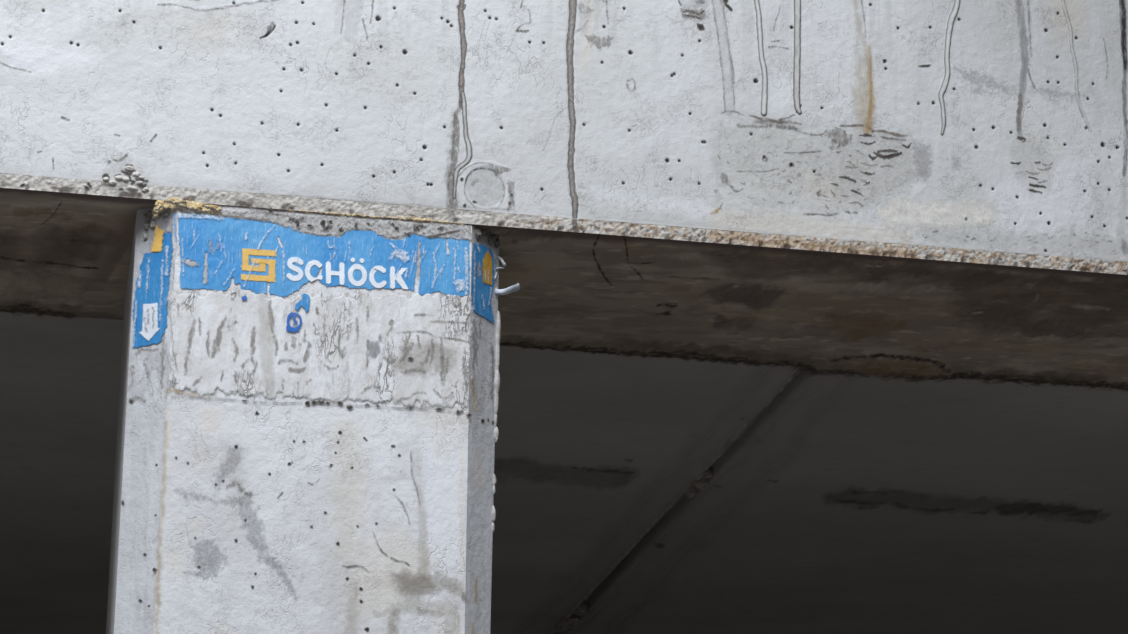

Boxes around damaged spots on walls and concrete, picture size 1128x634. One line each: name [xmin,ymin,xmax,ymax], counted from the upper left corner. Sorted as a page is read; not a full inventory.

crack [447,0,472,215]
crack [566,0,648,283]
water stain [754,0,767,116]
water stain [793,0,802,114]
rust [865,61,873,132]
water stain [939,0,960,135]
water stain [1016,0,1035,140]
water stain [1119,0,1128,176]